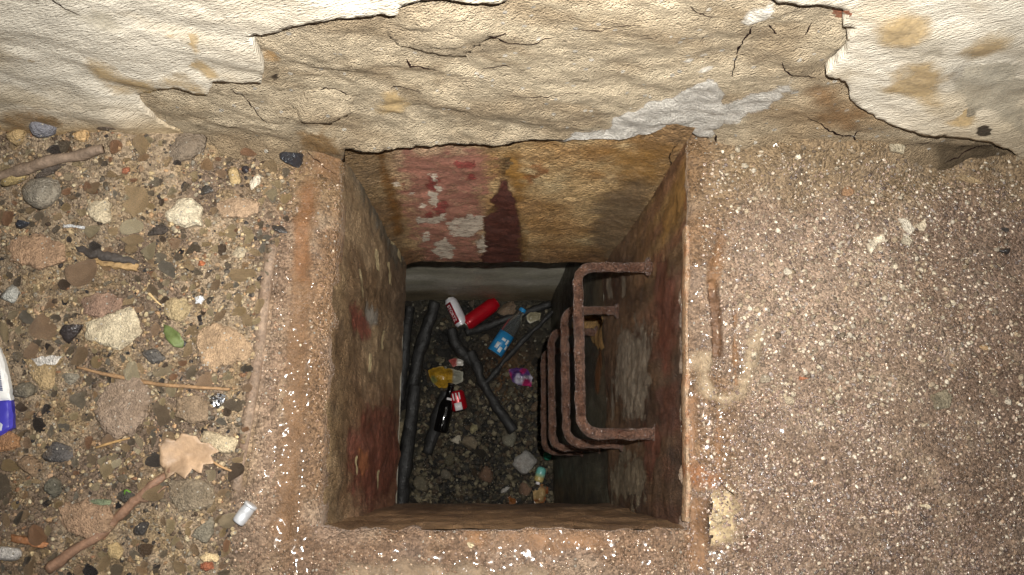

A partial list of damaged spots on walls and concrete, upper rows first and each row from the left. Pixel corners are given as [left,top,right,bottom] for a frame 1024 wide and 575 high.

water stain [883,18,925,46]
crack [483,33,552,69]
crack [732,25,776,76]
water stain [970,42,1002,56]
water stain [889,65,937,97]
flaking render [139,0,1014,261]
crack [809,118,859,140]
crack [905,137,990,164]